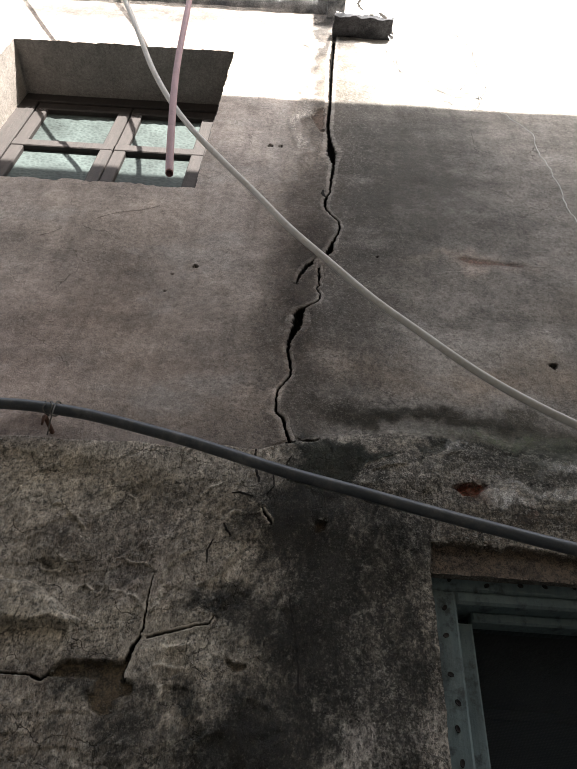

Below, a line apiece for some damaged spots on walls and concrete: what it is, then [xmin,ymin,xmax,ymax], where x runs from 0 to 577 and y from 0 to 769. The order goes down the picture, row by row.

crack [356,0,394,39]
crack [232,34,344,525]
water stain [290,437,398,483]
crack [205,523,231,563]
crack [118,572,216,683]
water stain [179,479,376,769]
crack [0,669,51,684]